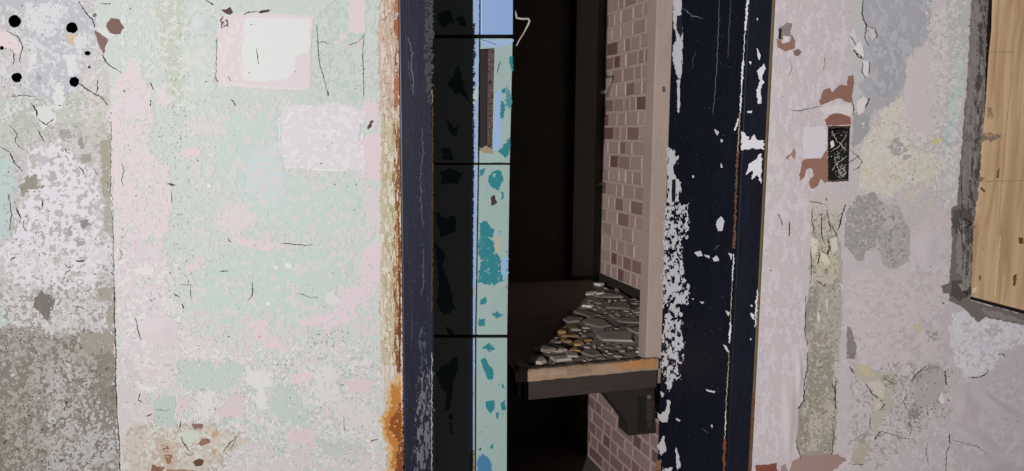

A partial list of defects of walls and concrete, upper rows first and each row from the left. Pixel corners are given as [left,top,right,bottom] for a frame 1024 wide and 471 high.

peeling [672,0,683,113]
peeling [0,0,401,471]
rust [376,0,404,471]
peeling [657,436,681,471]
peeling [647,147,734,438]
spalling [734,0,1024,471]
crack [831,353,1005,470]